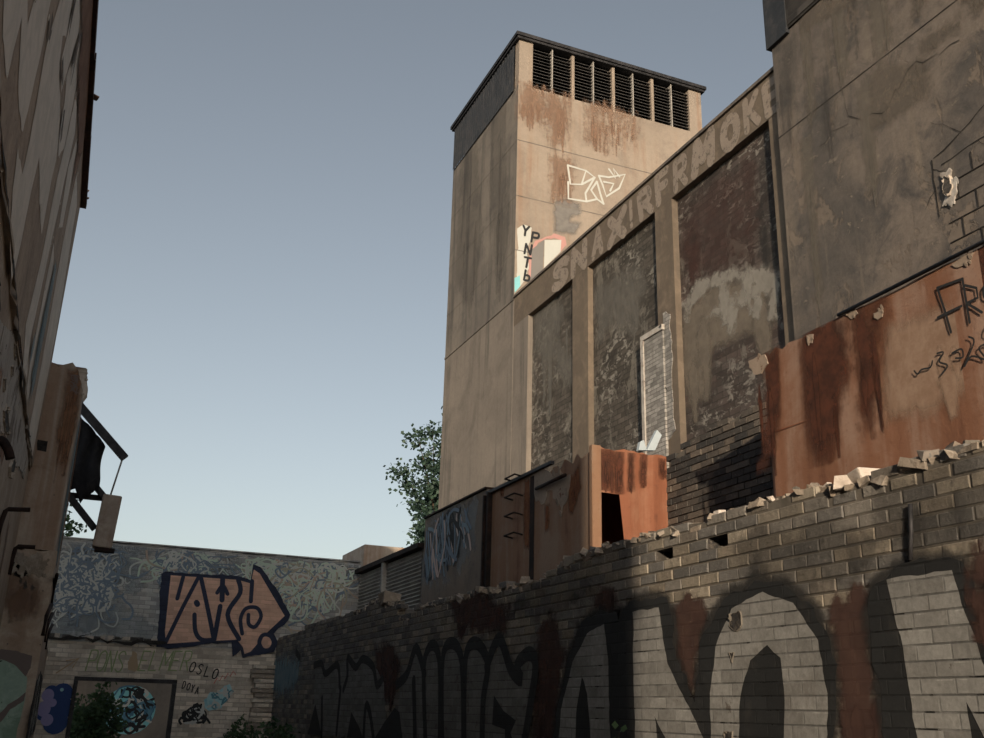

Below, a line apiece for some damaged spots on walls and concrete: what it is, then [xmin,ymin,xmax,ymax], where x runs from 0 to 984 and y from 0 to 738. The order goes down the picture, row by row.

peeling [0,0,81,479]
rust [519,84,573,203]
rust [585,104,635,153]
crack [820,40,959,146]
peeling [940,168,959,207]
crack [926,105,984,217]
peeling [663,311,676,440]
rust [758,346,780,475]
rust [801,295,886,462]
rust [601,449,647,494]
spalling [708,534,728,550]